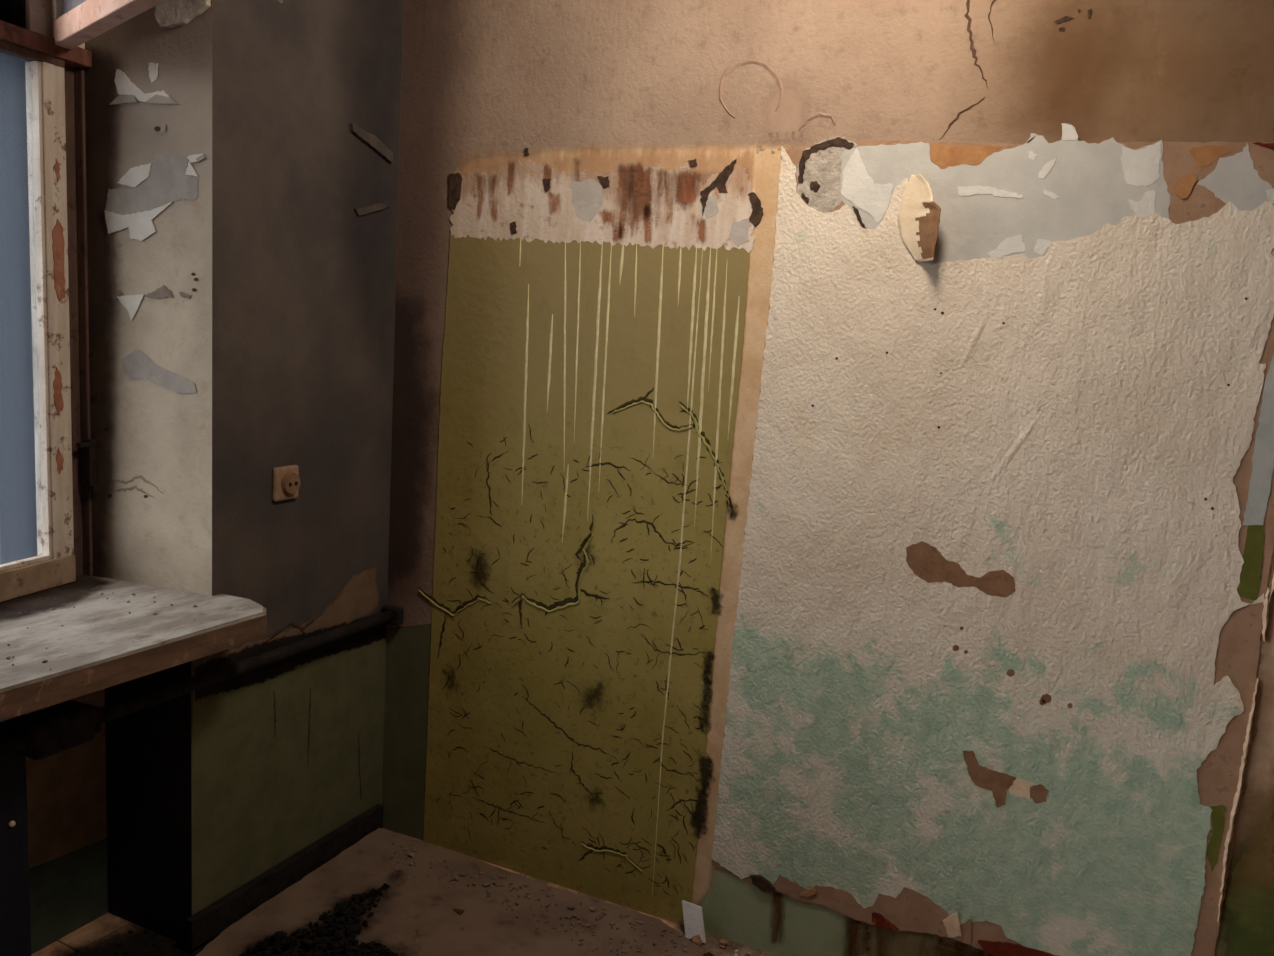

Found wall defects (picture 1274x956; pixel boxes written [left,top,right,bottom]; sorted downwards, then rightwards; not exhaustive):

peeling [109,62,179,105]
crack [939,0,996,140]
peeling [104,153,205,241]
leakage [547,239,581,542]
leakage [587,240,637,521]
spalling [216,566,379,660]
crack [418,387,733,896]
leakage [652,244,740,895]
peeling [448,123,1274,905]
corrosion [772,892,783,943]
peeling [750,874,972,943]
corrosion [847,918,884,956]